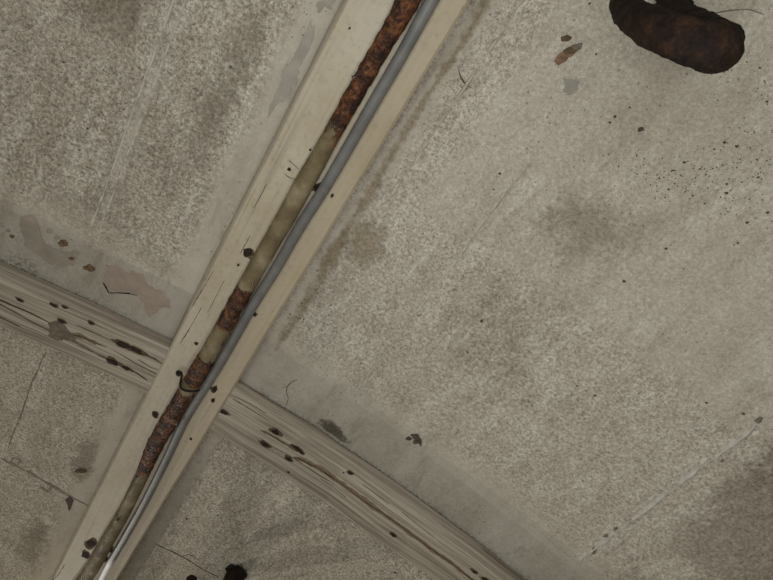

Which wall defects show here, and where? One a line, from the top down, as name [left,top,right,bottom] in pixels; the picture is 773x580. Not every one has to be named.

spalling [554,35,582,65]
peeling [563,78,586,95]
rust [317,0,488,281]
peeling [0,215,171,317]